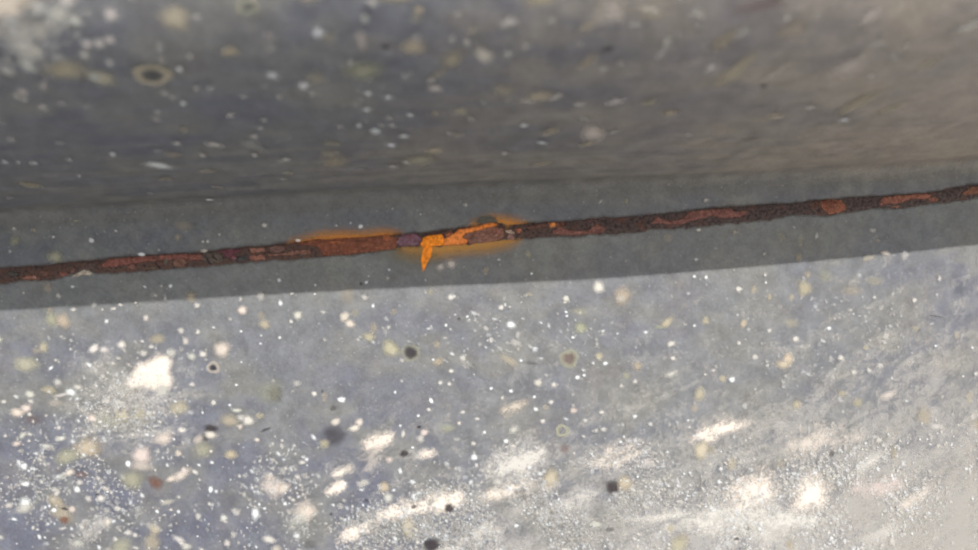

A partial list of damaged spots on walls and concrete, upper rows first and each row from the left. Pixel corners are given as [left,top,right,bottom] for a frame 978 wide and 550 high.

corrosion [811,199,846,215]
corrosion [880,193,938,209]
corrosion [651,208,748,225]
corrosion [85,218,606,271]